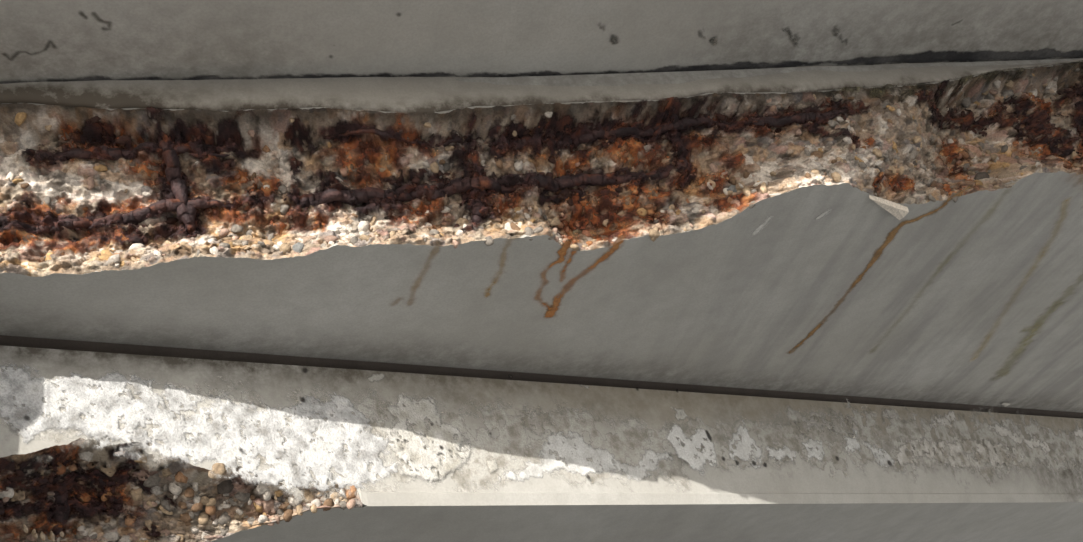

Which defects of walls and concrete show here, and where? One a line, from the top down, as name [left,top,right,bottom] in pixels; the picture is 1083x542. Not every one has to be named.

spalling [0,60,1083,277]
corrosion [536,235,625,318]
corrosion [788,186,971,354]
water stain [39,398,95,442]
water stain [109,393,171,460]
spalling [0,364,470,542]
water stain [164,385,1083,497]